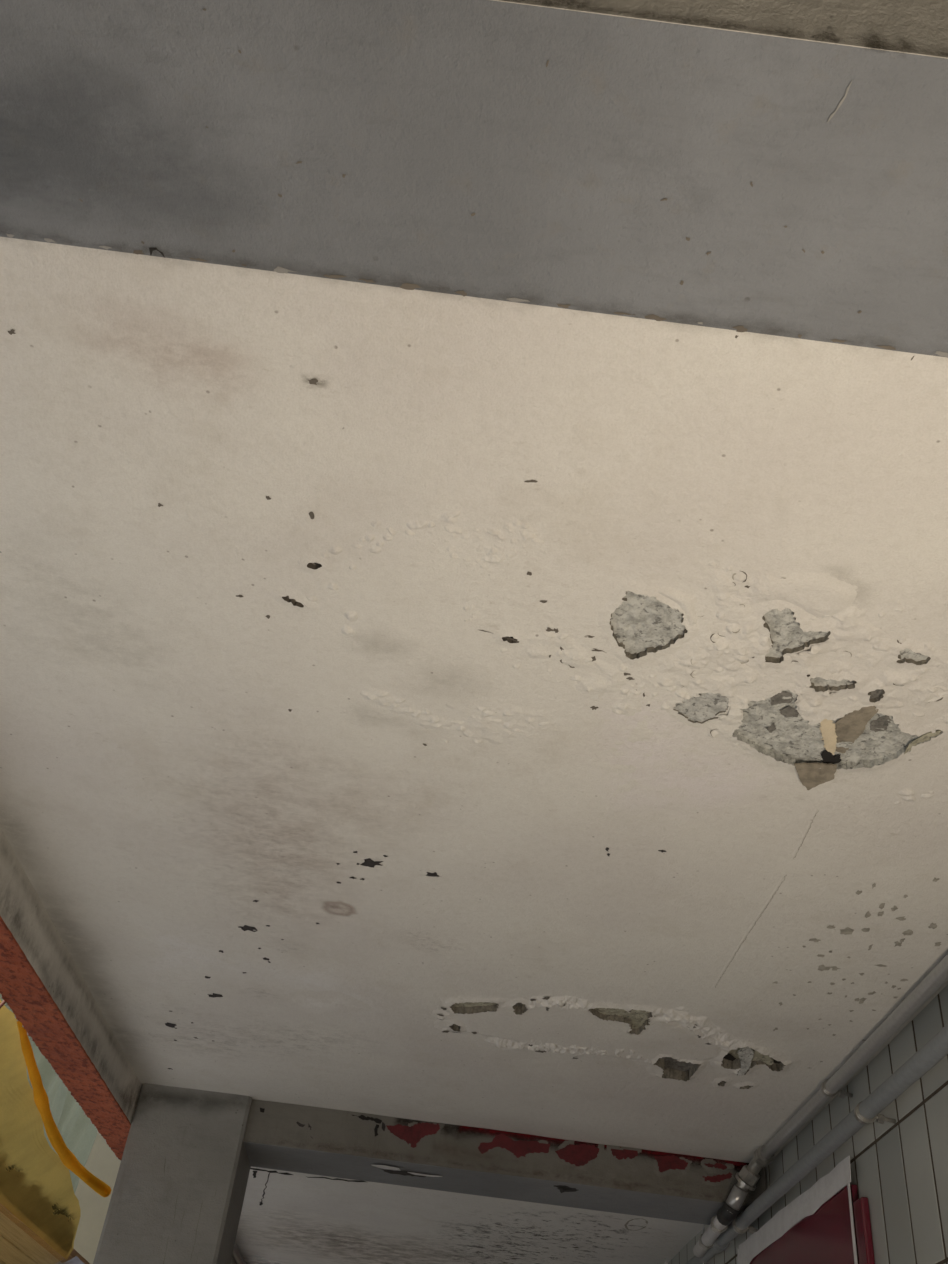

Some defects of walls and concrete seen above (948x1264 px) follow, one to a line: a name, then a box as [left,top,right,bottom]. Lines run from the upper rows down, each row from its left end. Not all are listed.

spalling [587,574,709,680]
spalling [665,600,948,790]
spalling [435,993,531,1035]
spalling [586,999,668,1035]
spalling [641,1028,823,1090]
peeling [386,1122,445,1148]
peeling [478,1134,737,1186]